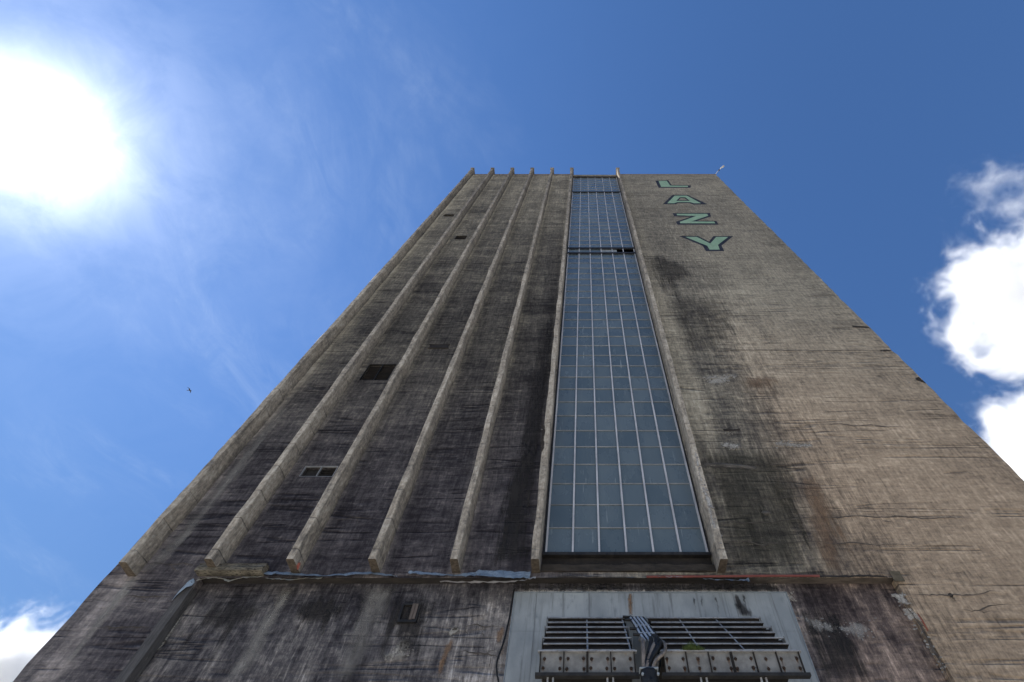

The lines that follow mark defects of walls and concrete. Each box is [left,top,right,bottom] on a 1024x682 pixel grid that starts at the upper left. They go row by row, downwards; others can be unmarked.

water stain [802,610,868,677]
crack [905,590,1006,678]